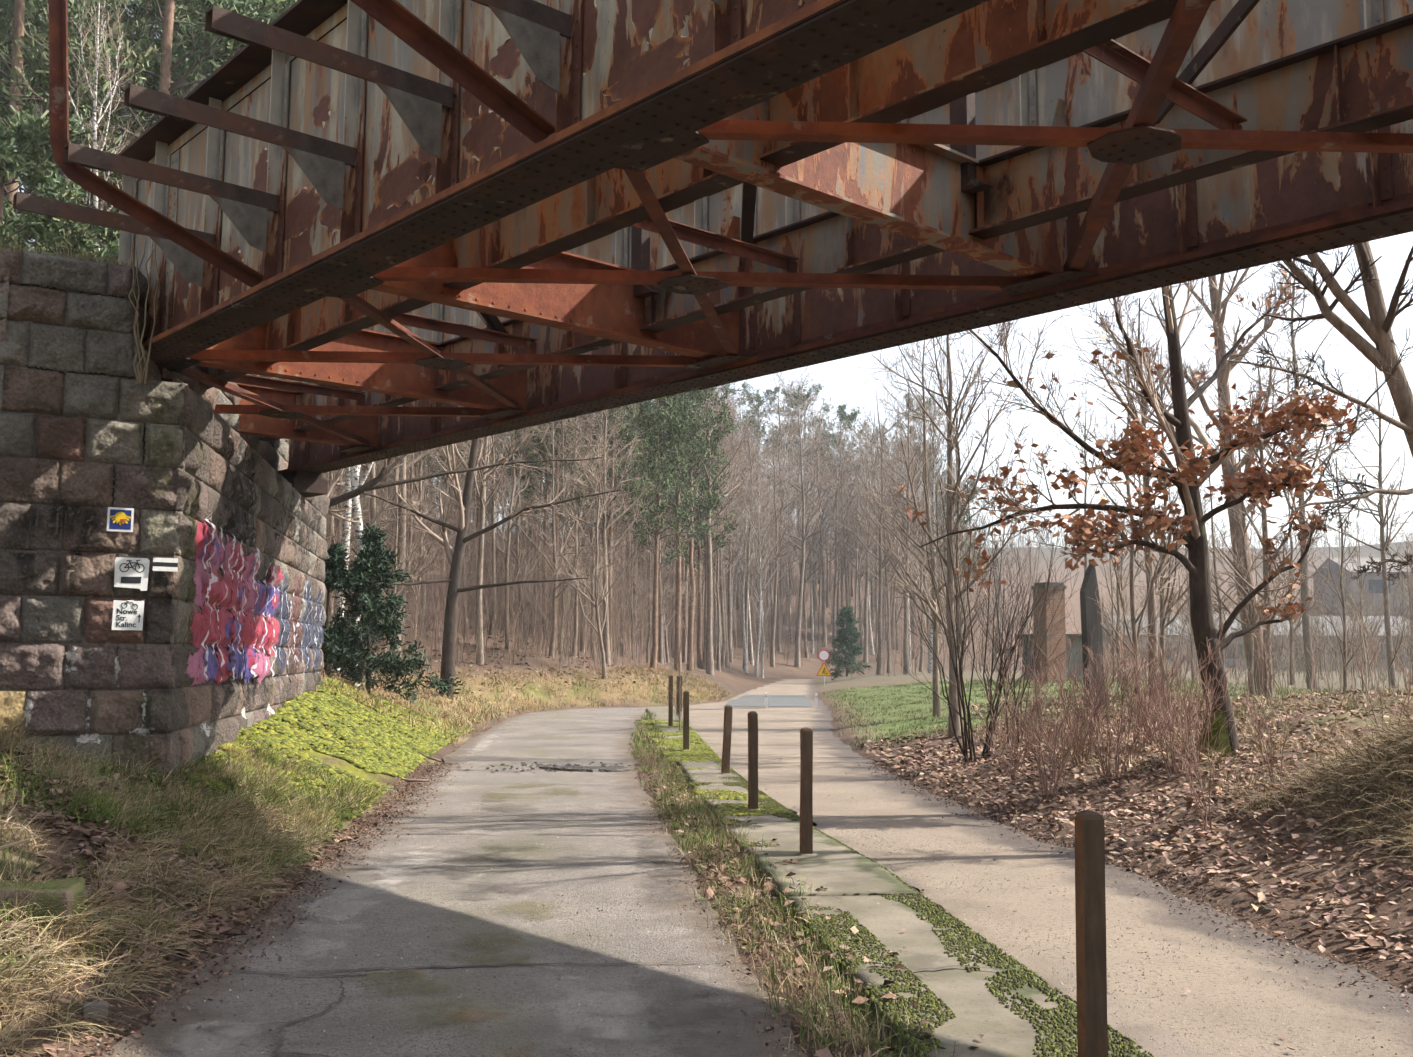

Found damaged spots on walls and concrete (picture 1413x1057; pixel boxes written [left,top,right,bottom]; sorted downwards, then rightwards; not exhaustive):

peeling [488,37,521,79]
peeling [582,0,597,77]
peeling [603,0,694,102]
peeling [313,94,331,128]
peeling [462,89,506,161]
peeling [253,146,268,192]
peeling [283,187,341,242]
crack [153,961,721,1057]